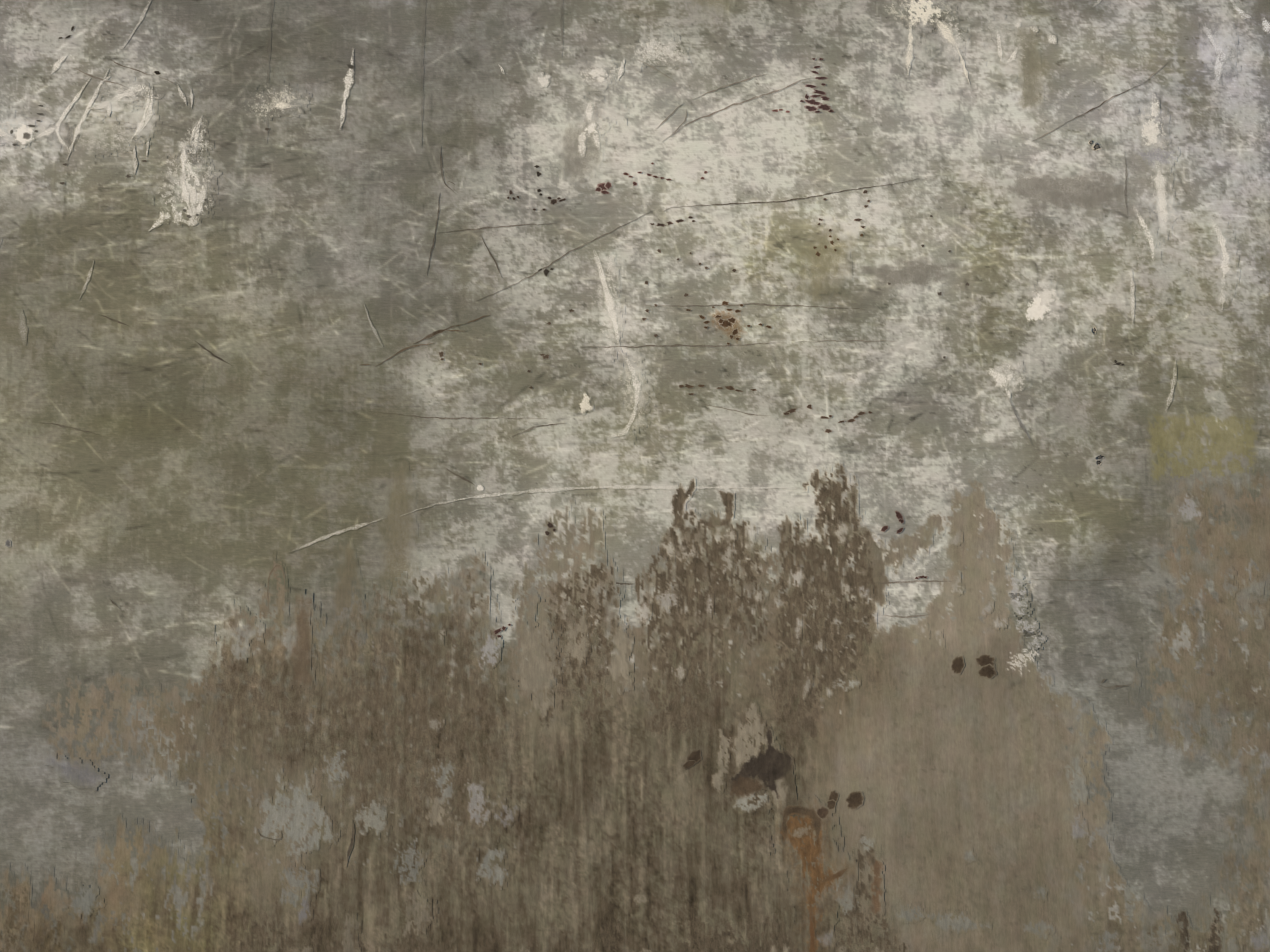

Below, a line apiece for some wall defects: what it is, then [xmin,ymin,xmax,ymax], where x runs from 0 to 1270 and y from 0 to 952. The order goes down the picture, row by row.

damp [266,455,801,687]
damp [682,749,702,769]
damp [728,726,799,820]
damp [817,790,864,819]
rust [764,791,858,952]
damp [1174,907,1225,952]